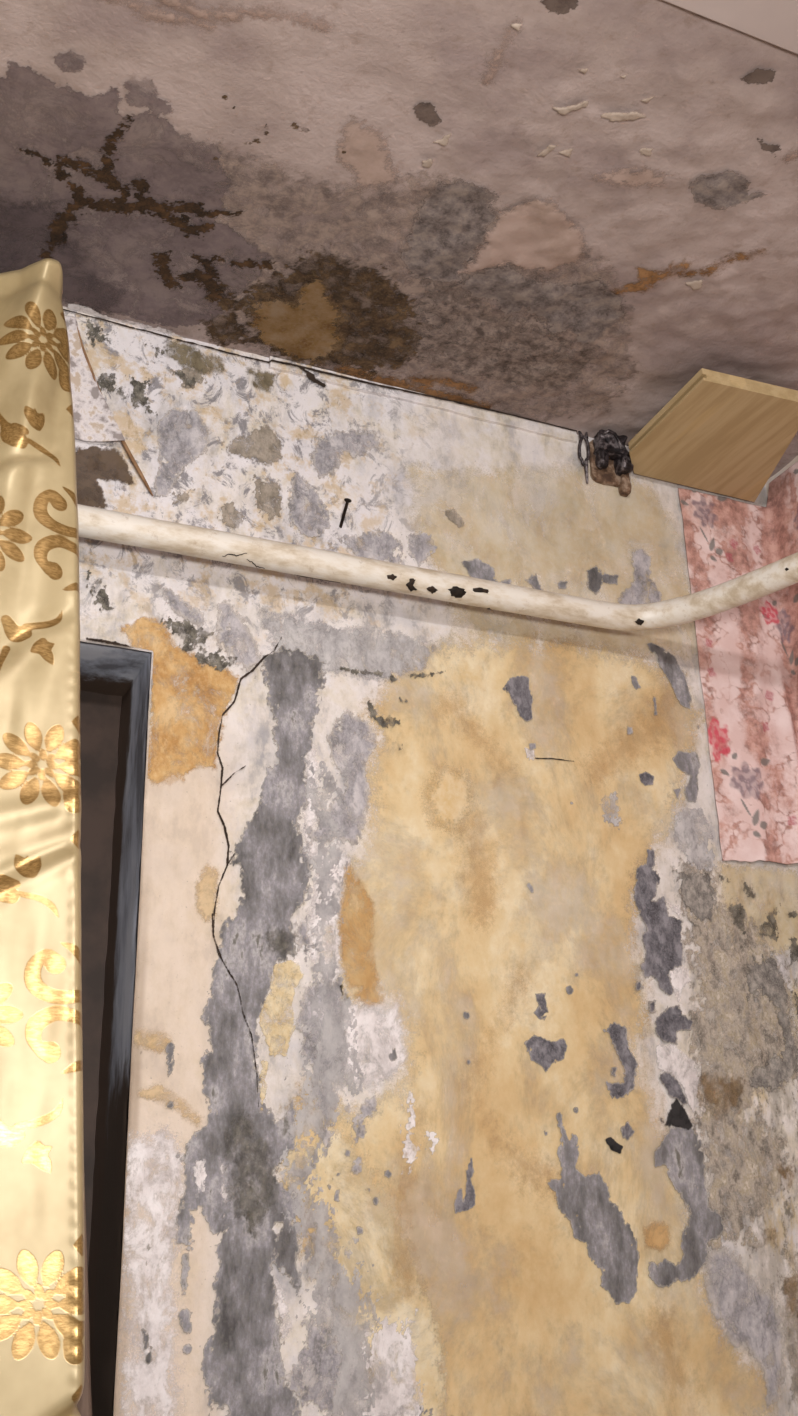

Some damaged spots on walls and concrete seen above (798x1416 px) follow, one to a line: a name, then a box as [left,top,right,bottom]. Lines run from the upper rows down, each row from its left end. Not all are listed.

leakage [0,52,636,421]
peeling [336,115,400,192]
peeling [401,102,626,391]
peeling [552,96,655,122]
peeling [757,138,781,153]
leakage [422,471,689,603]
crack [212,637,282,1107]
peeling [160,585,436,1416]
leakage [121,602,779,1416]
spalling [454,1158,476,1214]
spalling [544,751,798,1408]
peeling [141,1329,152,1364]